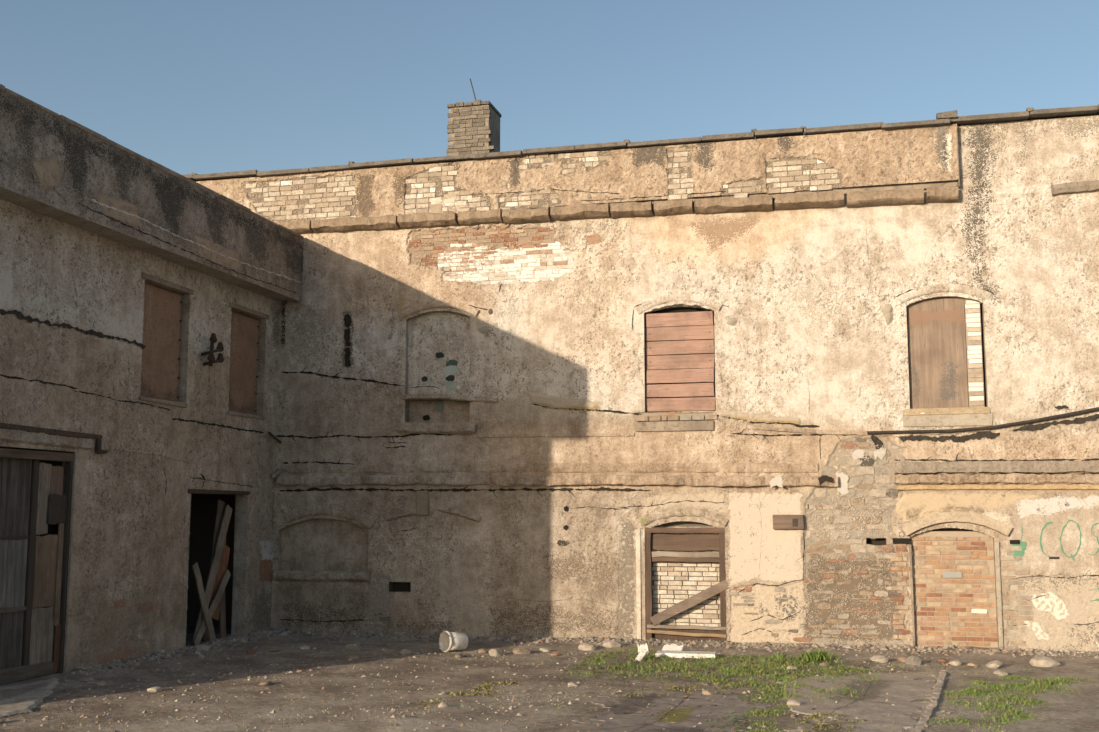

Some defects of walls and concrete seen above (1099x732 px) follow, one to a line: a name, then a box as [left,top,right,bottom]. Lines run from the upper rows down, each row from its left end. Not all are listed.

leakage [0,91,330,364]
flaking render [243,172,357,222]
flaking render [403,162,576,285]
flaking render [722,155,843,198]
leakage [932,125,950,175]
leakage [948,120,1035,306]
crack [282,365,403,386]
crack [0,374,725,511]
spalling [729,436,1099,661]